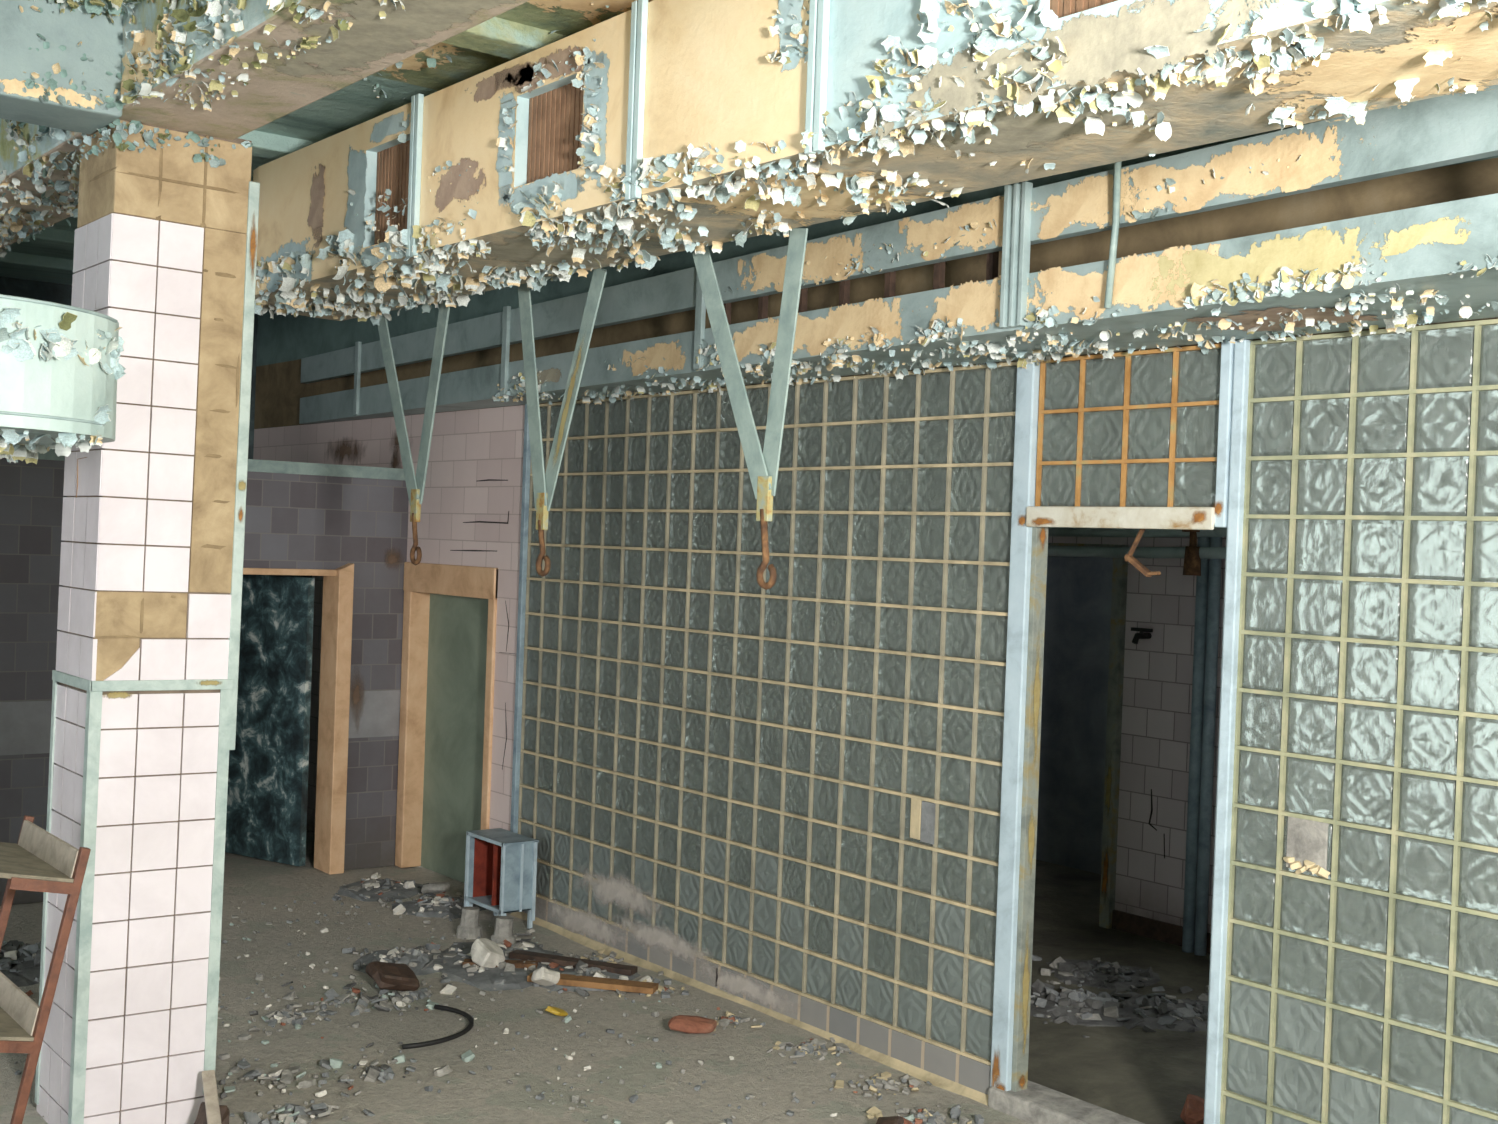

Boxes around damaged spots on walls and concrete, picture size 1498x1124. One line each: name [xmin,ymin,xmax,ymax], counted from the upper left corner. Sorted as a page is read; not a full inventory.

peeling [0,0,1498,681]
water stain [552,874,782,1009]